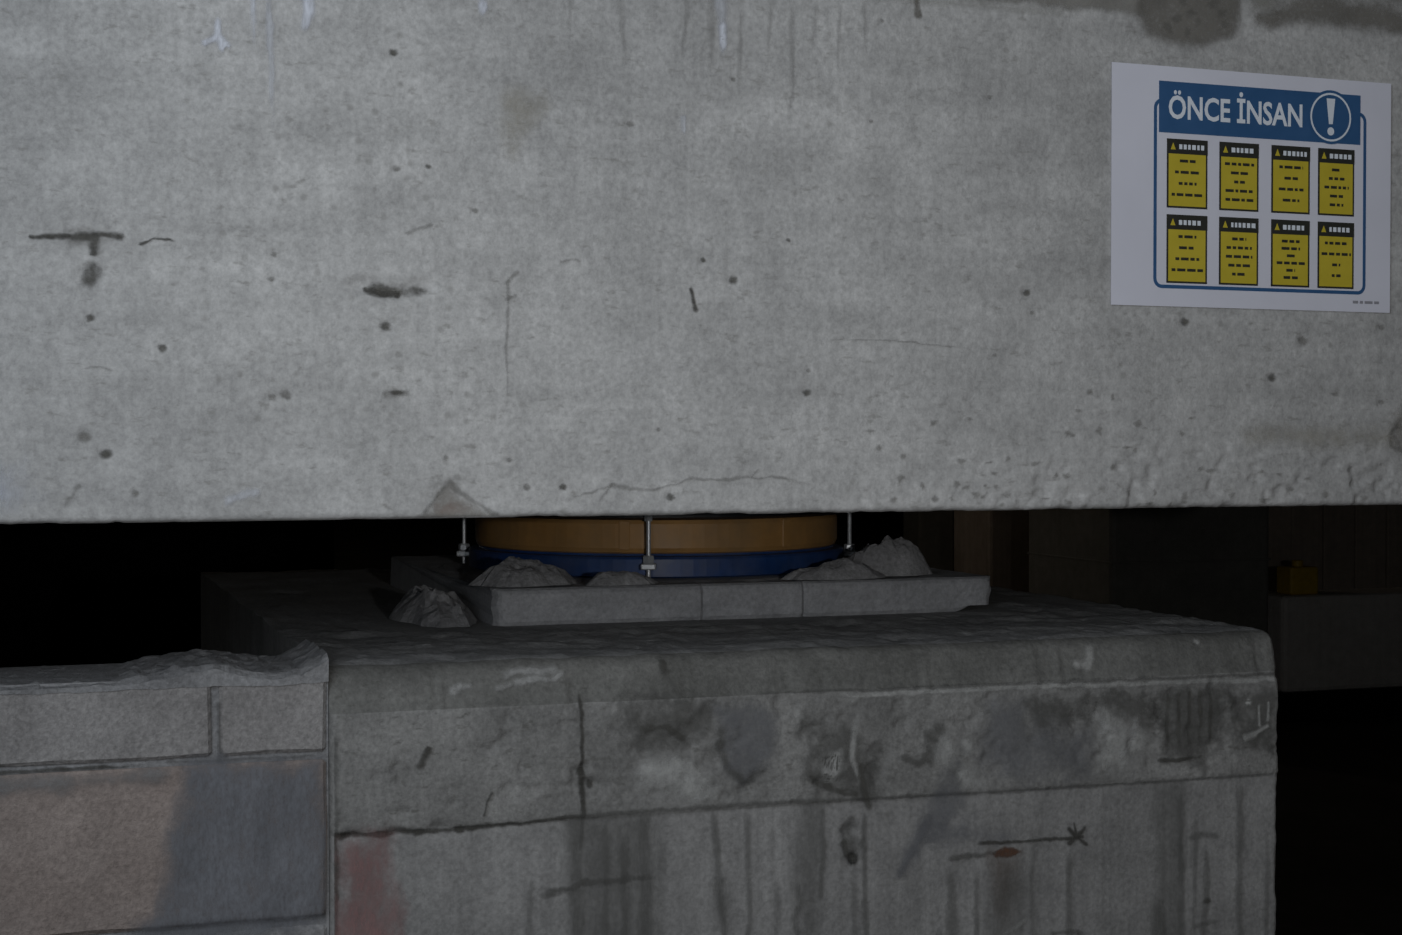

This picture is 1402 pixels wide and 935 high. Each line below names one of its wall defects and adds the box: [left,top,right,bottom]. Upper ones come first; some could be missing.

damp [997,0,1402,44]